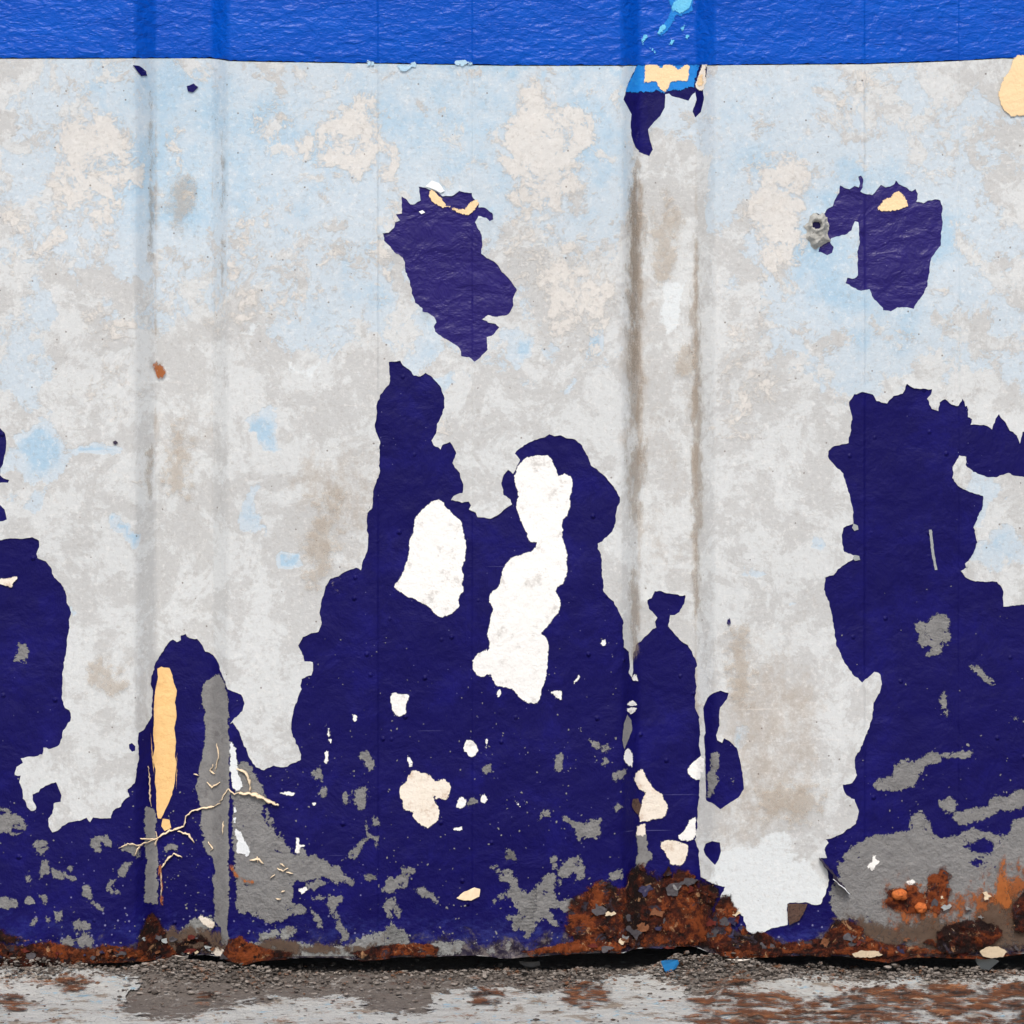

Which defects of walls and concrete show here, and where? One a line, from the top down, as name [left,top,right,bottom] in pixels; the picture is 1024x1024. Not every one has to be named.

peeling [624,0,707,156]
rust [153,361,166,379]
peeling [0,361,744,961]
peeling [765,384,1024,959]
crack [120,788,240,896]
rust [0,866,440,994]
peeling [731,914,750,934]
rust [522,858,1024,963]